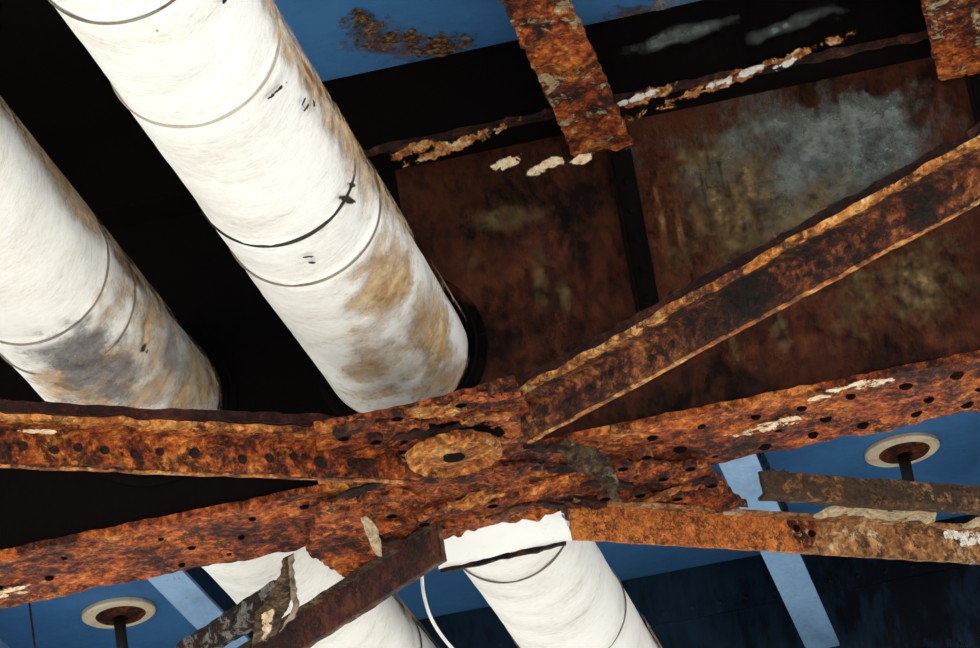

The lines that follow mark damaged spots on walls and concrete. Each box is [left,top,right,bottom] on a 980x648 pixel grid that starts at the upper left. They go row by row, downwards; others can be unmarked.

rust [617,32,855,122]
rust [391,122,507,168]
rust [490,154,522,170]
rust [527,153,592,175]
rust [645,181,722,286]
rust [732,243,980,368]
rust [879,442,930,464]
peeling [0,582,46,598]
rust [95,606,146,626]
peeling [261,609,275,640]